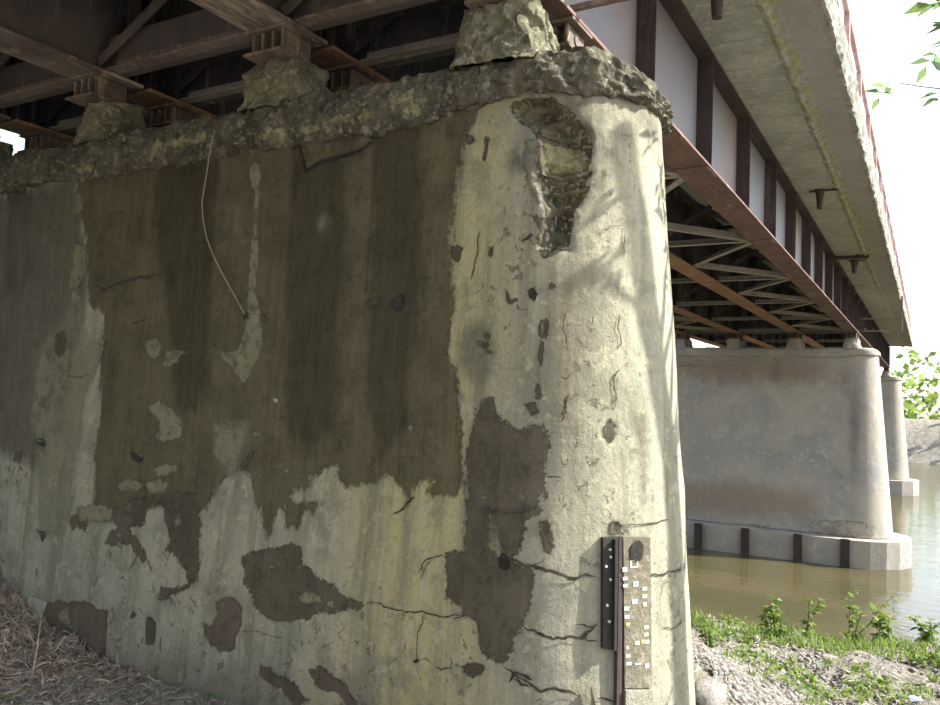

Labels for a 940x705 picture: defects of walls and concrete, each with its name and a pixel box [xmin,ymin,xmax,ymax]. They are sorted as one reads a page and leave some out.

spalling [511,97,593,258]
leakage [0,87,551,664]
peeling [539,520,555,555]
crack [507,557,595,581]
crack [651,568,684,576]
peeling [203,542,372,652]
peeling [22,596,108,658]
crack [372,602,465,671]
crack [523,624,597,641]
peeling [260,665,311,705]
peeling [308,665,362,705]
crack [502,666,614,702]